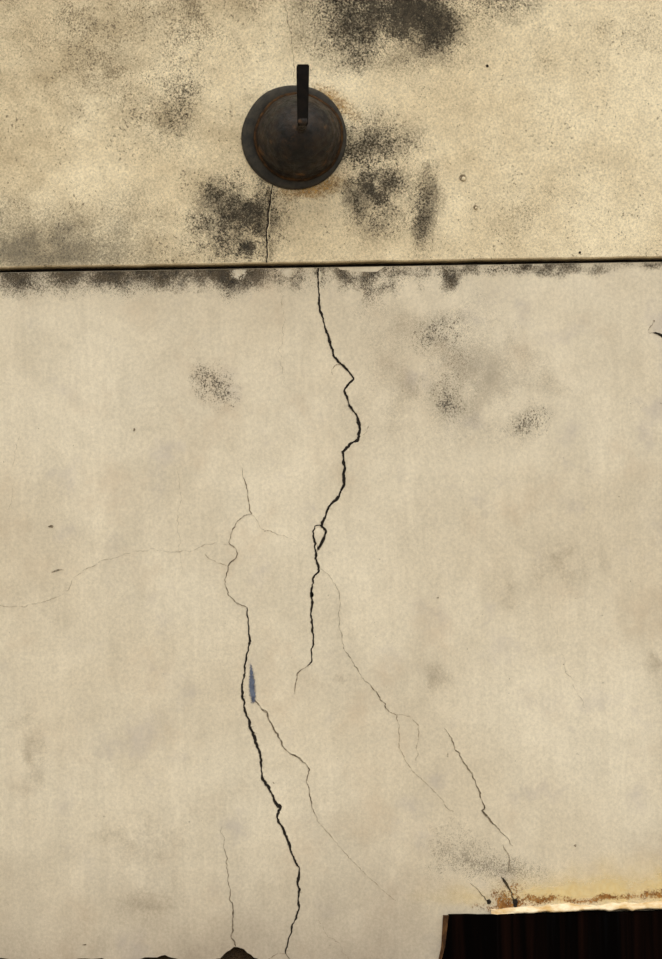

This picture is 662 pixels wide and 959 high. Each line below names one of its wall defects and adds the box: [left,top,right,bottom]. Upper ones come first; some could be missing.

water stain [289,0,528,70]
water stain [180,171,301,261]
crack [266,185,274,263]
water stain [329,107,433,250]
crack [295,268,452,811]
crack [206,470,355,959]
crack [445,728,518,907]
rust [472,881,662,911]
spalling [218,947,255,959]